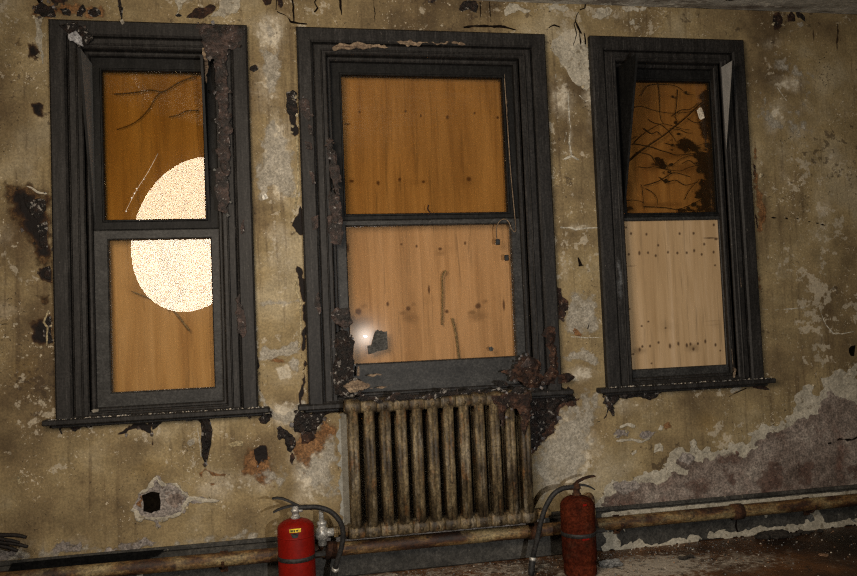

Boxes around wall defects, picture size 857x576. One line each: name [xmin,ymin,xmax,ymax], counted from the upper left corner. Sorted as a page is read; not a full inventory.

peeling [459,0,478,13]
spalling [550,35,590,91]
water stain [5,183,53,283]
spalling [583,345,857,517]
spalling [130,475,219,529]
peeling [601,510,857,551]